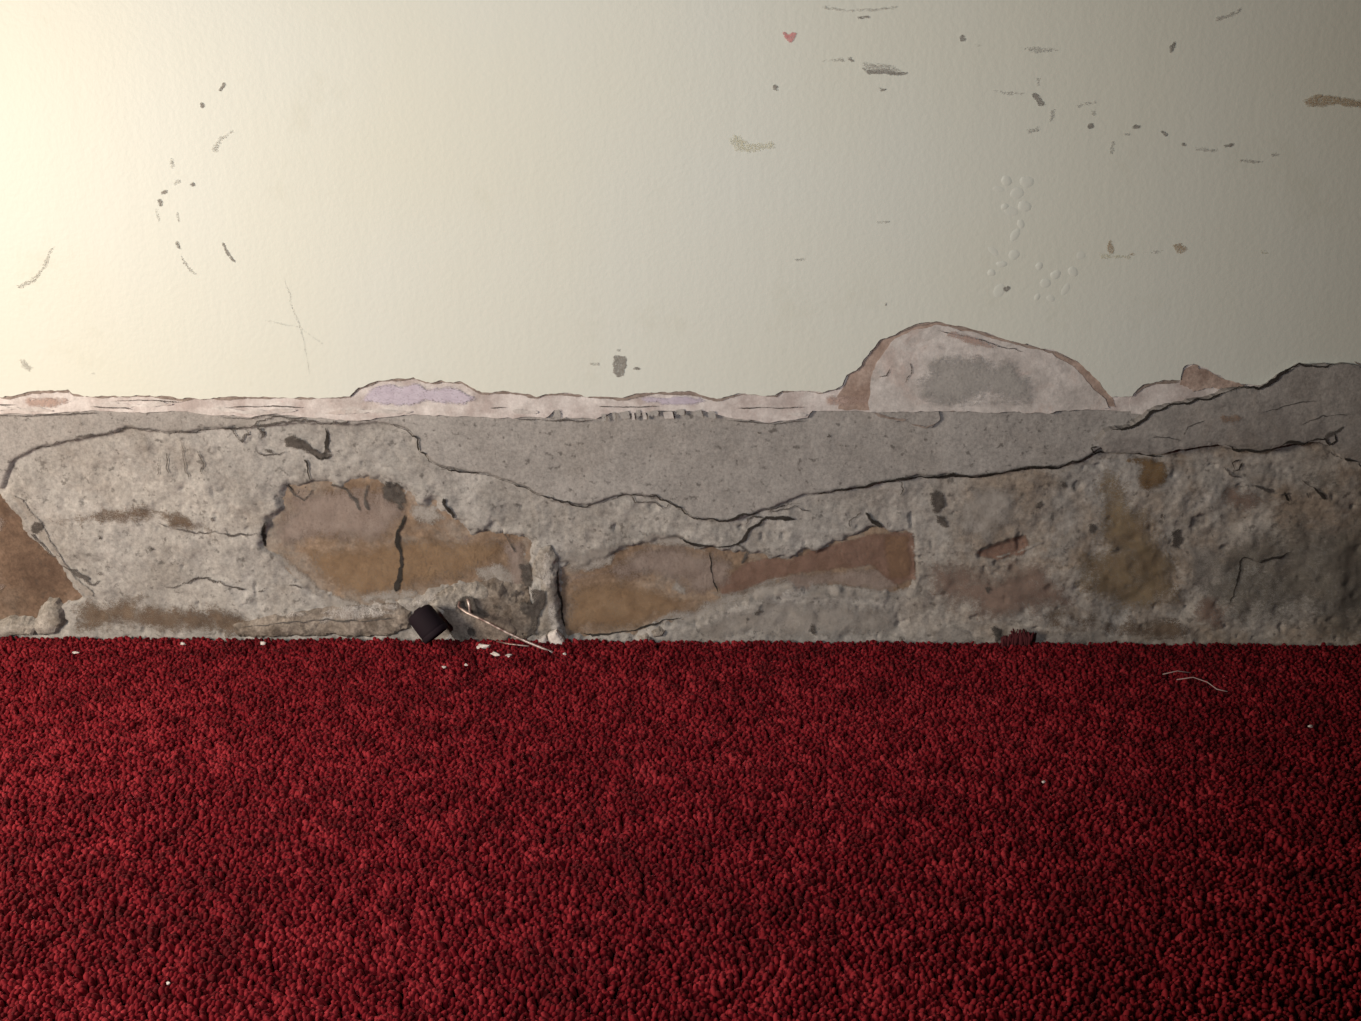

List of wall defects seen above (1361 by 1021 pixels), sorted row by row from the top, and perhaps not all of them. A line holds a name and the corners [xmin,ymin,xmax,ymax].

peeling [0,321,1259,460]
crack [10,363,1332,545]
crack [1224,427,1361,501]
flaking render [0,494,93,638]
crack [394,515,405,592]
flaking render [233,476,920,645]
spalling [929,489,948,528]
flaking render [977,535,1042,560]
spalling [1160,514,1183,549]